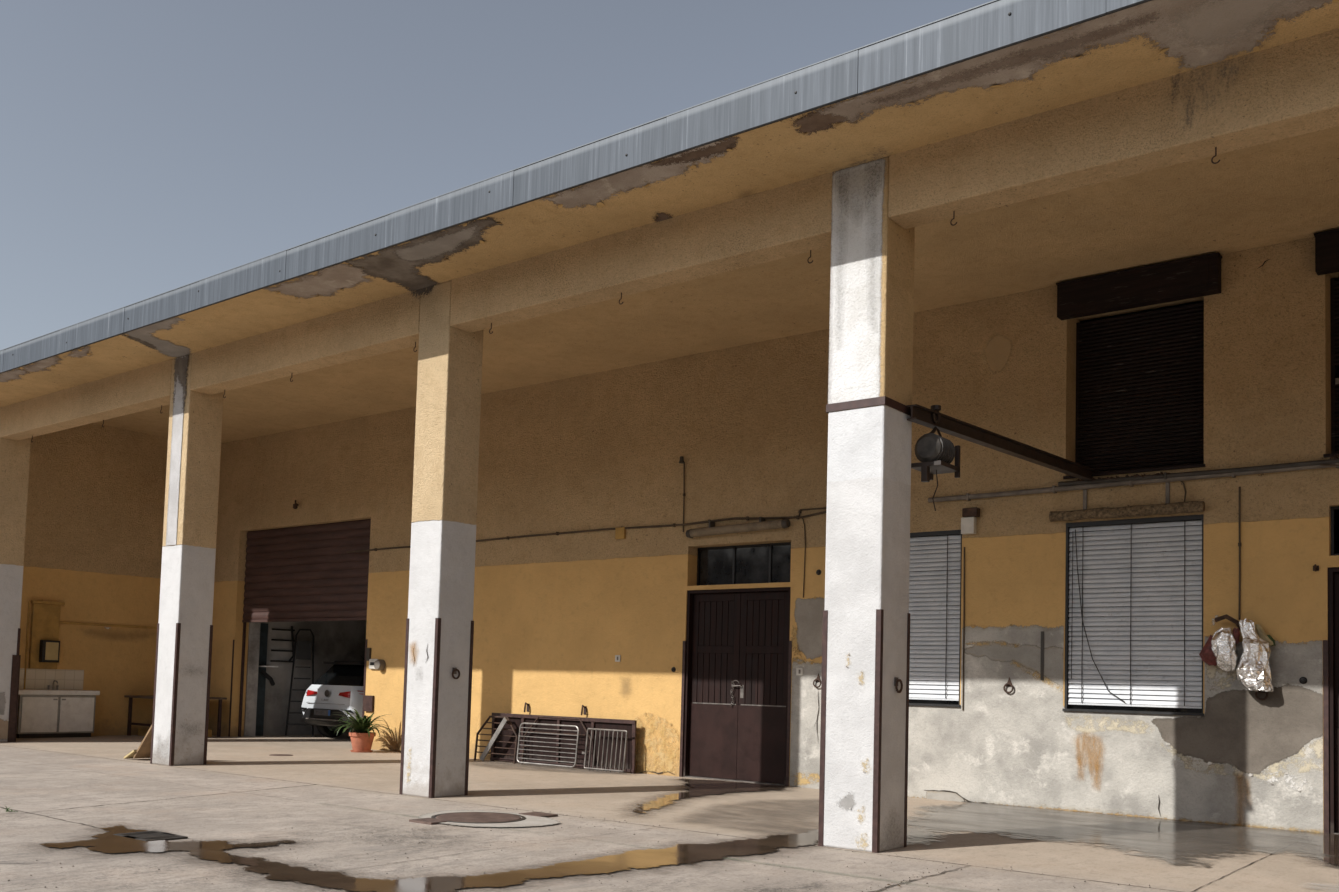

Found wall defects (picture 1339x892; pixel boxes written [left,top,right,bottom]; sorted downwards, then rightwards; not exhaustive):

peeling [812,0,1339,124]
peeling [533,137,740,209]
peeling [263,263,372,299]
flaking render [908,624,1323,833]